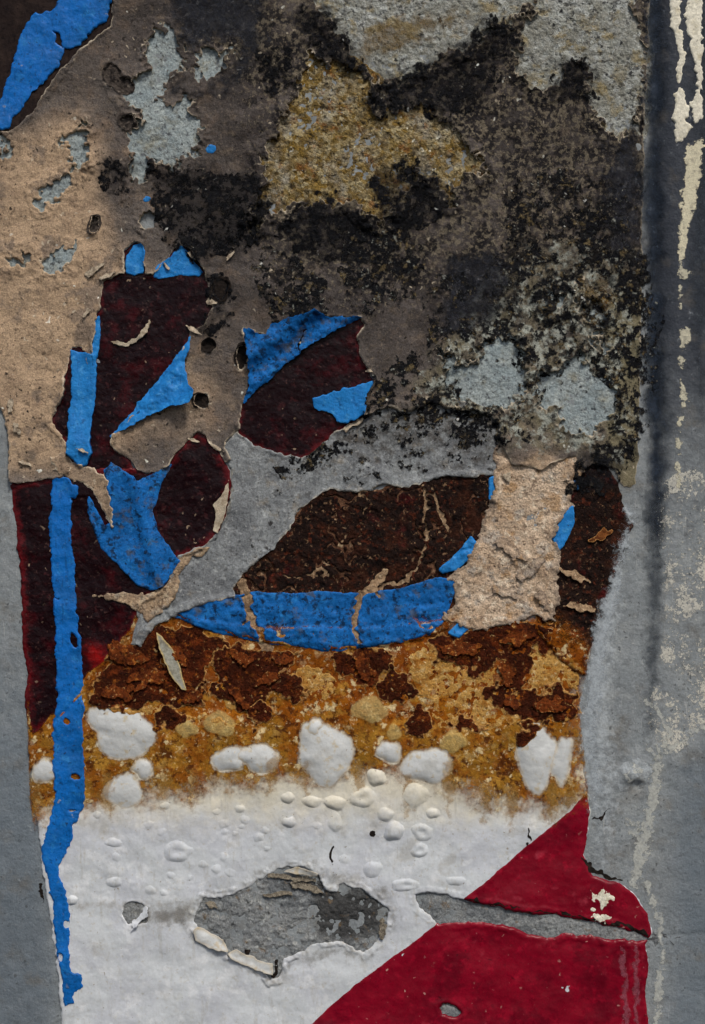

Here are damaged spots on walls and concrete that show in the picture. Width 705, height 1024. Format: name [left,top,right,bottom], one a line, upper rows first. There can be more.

spalling [102,22,236,184]
spalling [6,214,102,274]
peeling [84,263,116,280]
peeling [111,320,151,347]
spalling [186,325,216,353]
spalling [233,342,248,370]
spalling [191,392,209,408]
peeling [213,480,229,533]
peeling [234,475,493,595]
water stain [145,0,705,1024]
rust [27,614,589,824]
spalling [193,866,388,979]